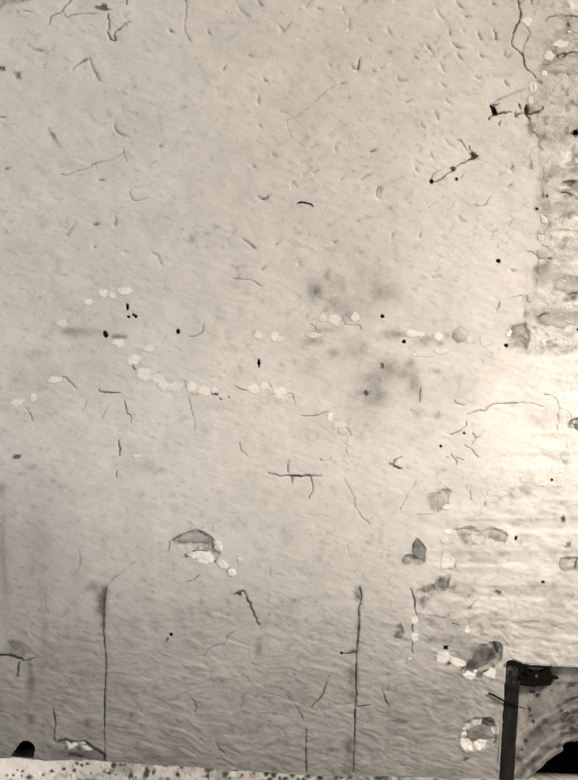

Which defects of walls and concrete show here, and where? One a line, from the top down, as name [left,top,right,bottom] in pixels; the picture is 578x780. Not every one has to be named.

crack [511,1,535,76]
spalling [172,529,242,577]
spalling [402,538,426,565]
spalling [416,526,517,606]
spalling [559,558,578,572]
crack [346,588,387,735]
spalling [435,642,502,680]
spalling [58,739,105,761]
spalling [460,717,500,760]